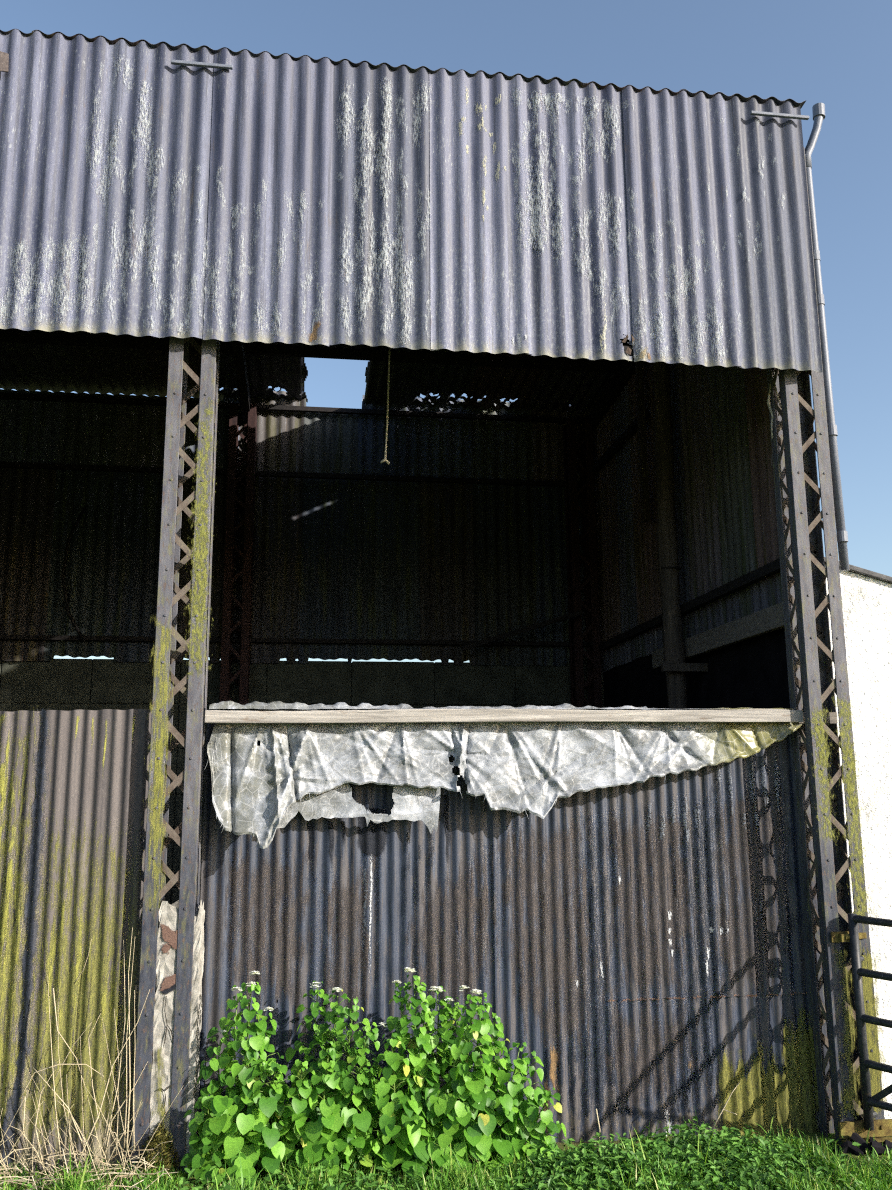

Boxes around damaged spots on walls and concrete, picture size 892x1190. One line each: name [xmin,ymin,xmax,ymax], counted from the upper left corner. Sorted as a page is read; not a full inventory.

water stain [0,709,48,1172]
water stain [46,904,91,1111]
water stain [101,971,128,1056]
corrosion [544,1046,558,1111]
water stain [724,1006,819,1133]